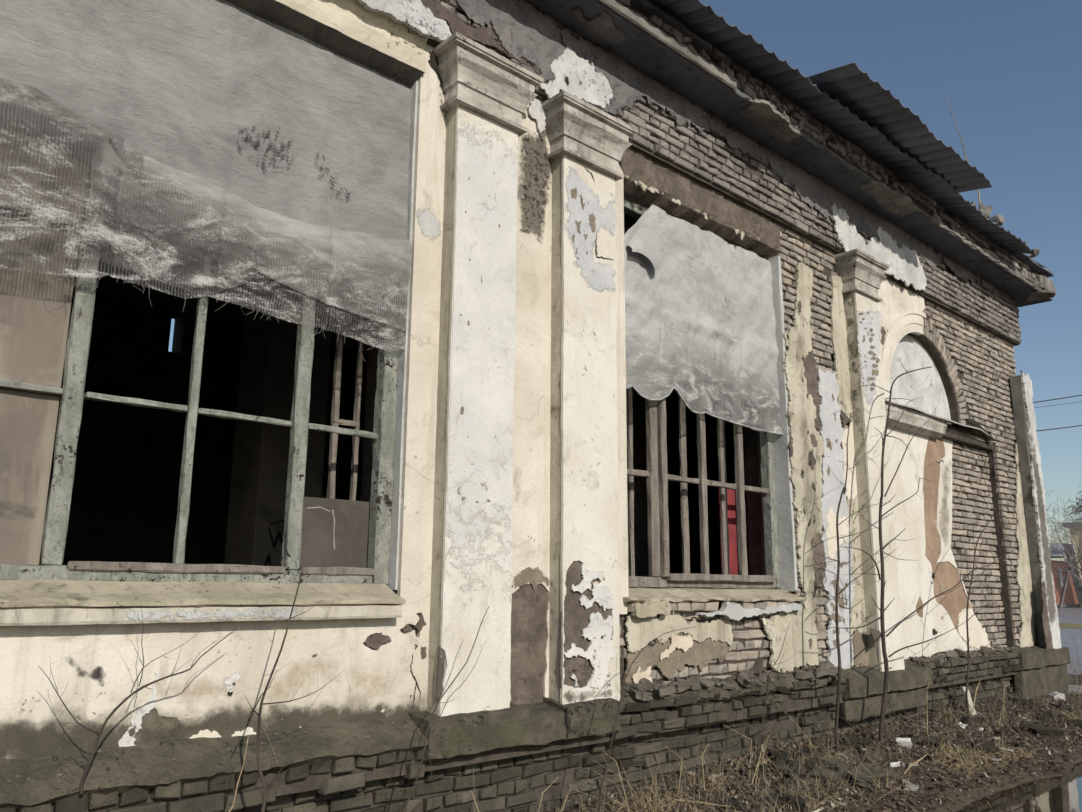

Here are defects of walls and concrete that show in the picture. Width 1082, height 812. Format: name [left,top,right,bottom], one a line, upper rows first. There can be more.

peeling [404,0,613,134]
peeling [831,203,927,291]
peeling [445,112,733,705]
peeling [760,262,888,673]
flaking render [922,438,990,650]
flaking render [118,672,180,747]
damp [0,699,425,760]
peeling [189,727,256,739]
peeling [224,672,242,696]
flaking render [364,633,392,650]
flaking render [402,614,445,701]